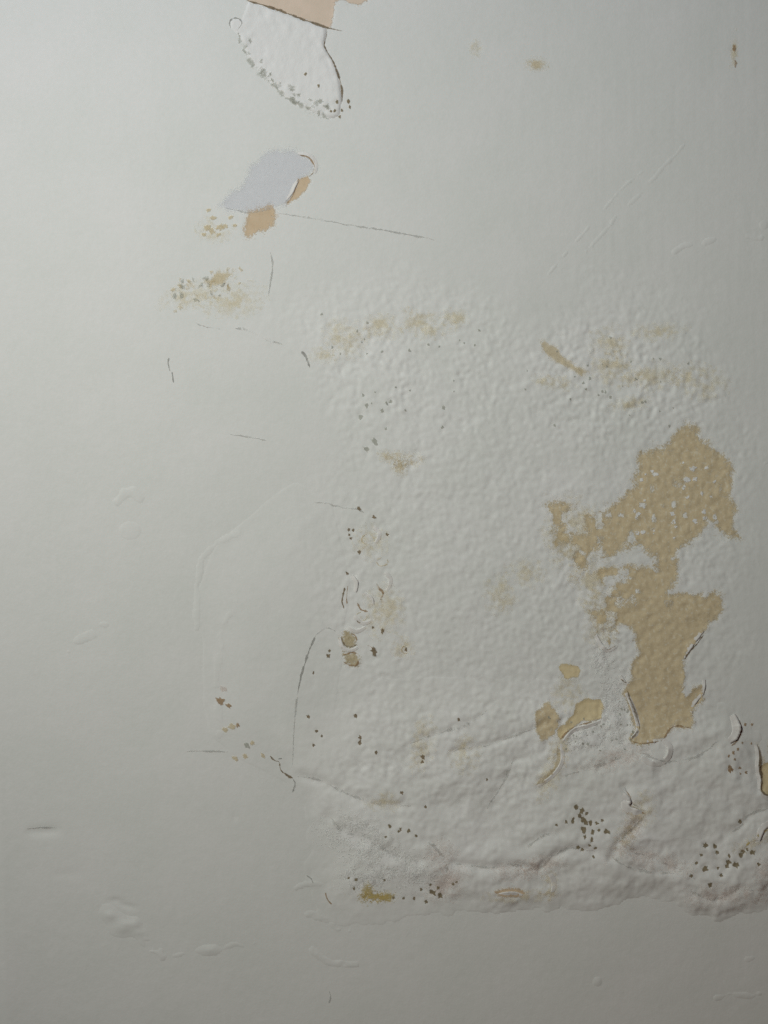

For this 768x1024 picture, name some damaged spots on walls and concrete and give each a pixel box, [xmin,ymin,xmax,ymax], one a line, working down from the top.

peeling [248,0,367,28]
peeling [224,151,318,236]
peeling [535,424,742,788]
peeling [754,744,768,801]